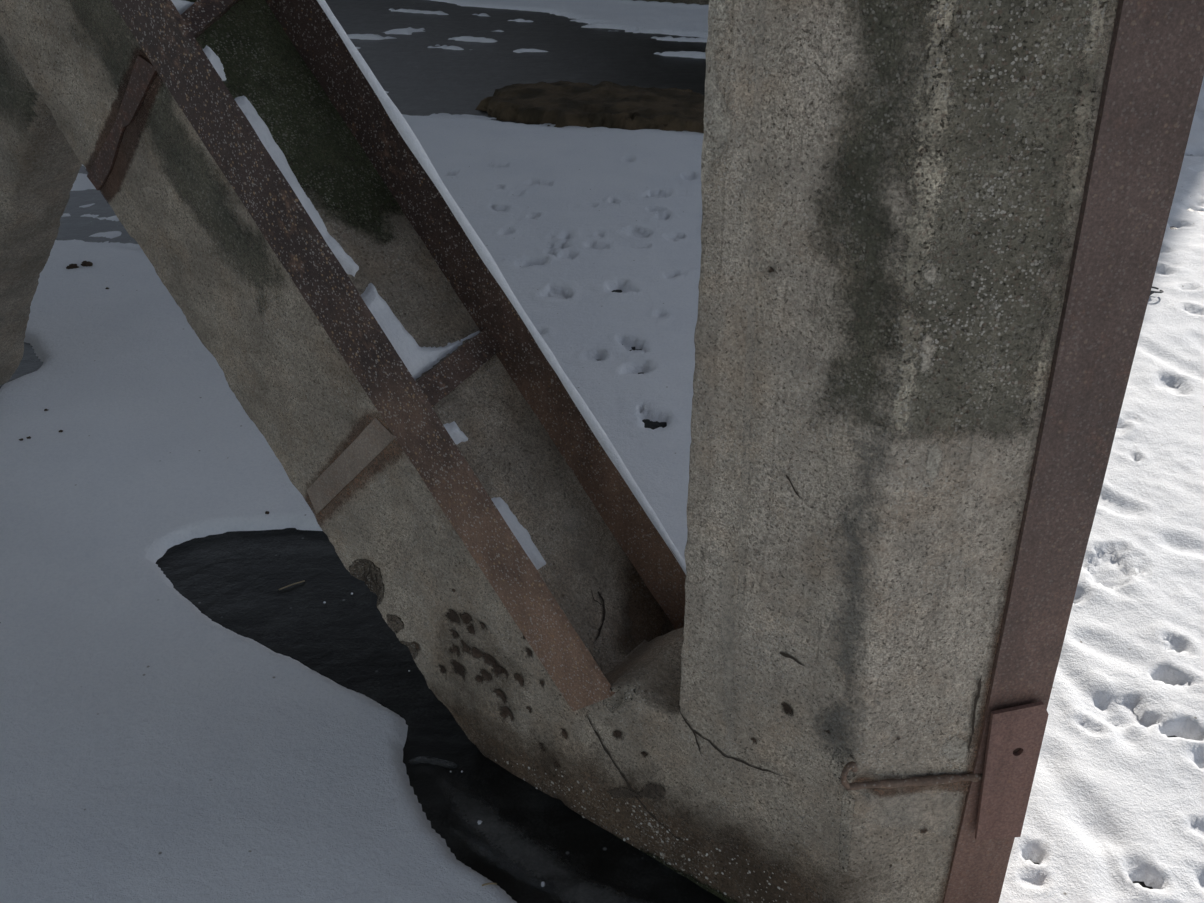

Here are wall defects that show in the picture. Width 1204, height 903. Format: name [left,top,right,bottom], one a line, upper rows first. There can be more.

water stain [67,0,143,90]
rust [85,48,162,203]
water stain [145,80,279,313]
water stain [815,0,1111,439]
rust [305,413,403,526]
spalling [439,609,523,721]
crack [586,715,692,847]
water stain [435,692,851,903]
crack [679,709,792,779]
water stain [815,446,880,753]
rust [855,576,1012,903]